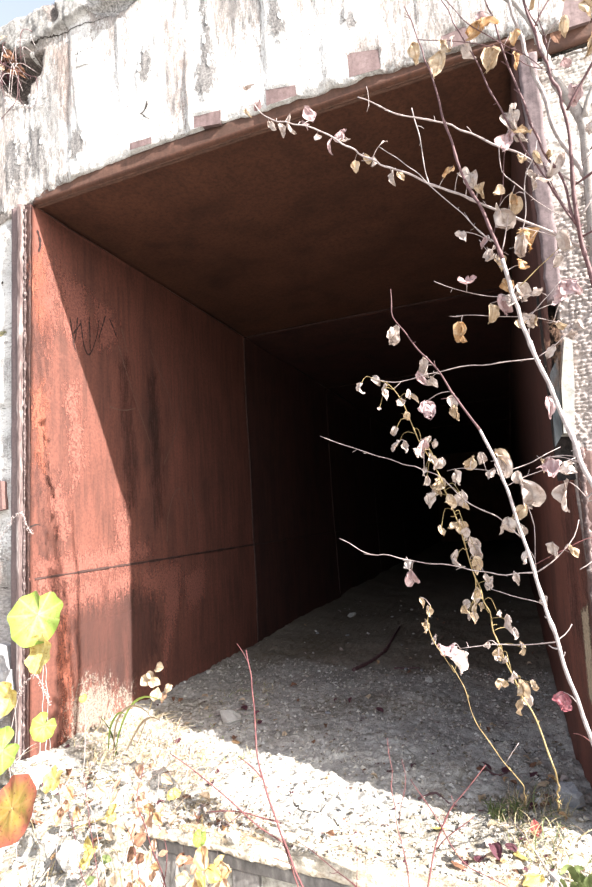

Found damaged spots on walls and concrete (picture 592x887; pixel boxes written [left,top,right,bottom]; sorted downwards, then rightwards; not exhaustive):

crack [31,15,116,45]
spalling [75,0,136,18]
spalling [0,45,46,111]
peeling [0,124,46,214]
rust [29,246,50,336]
rust [31,378,51,475]
rust [57,614,77,743]